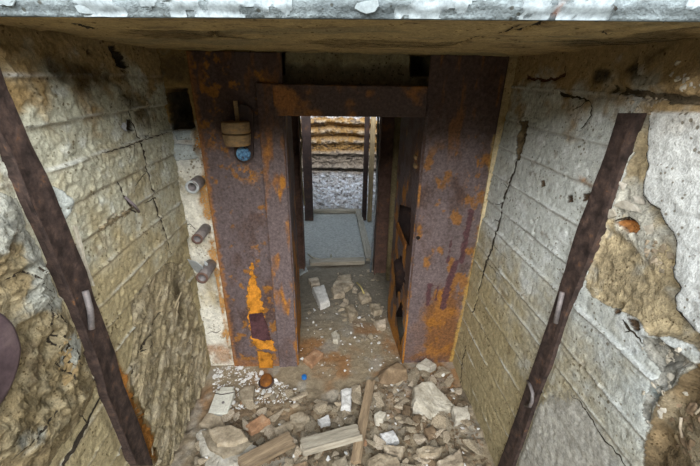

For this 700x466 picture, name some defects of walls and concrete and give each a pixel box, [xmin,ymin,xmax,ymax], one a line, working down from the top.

crack [102,100,171,253]
rust [199,175,211,220]
rust [246,263,276,368]
crack [472,124,528,312]
crack [560,91,593,129]
spalling [585,61,700,466]